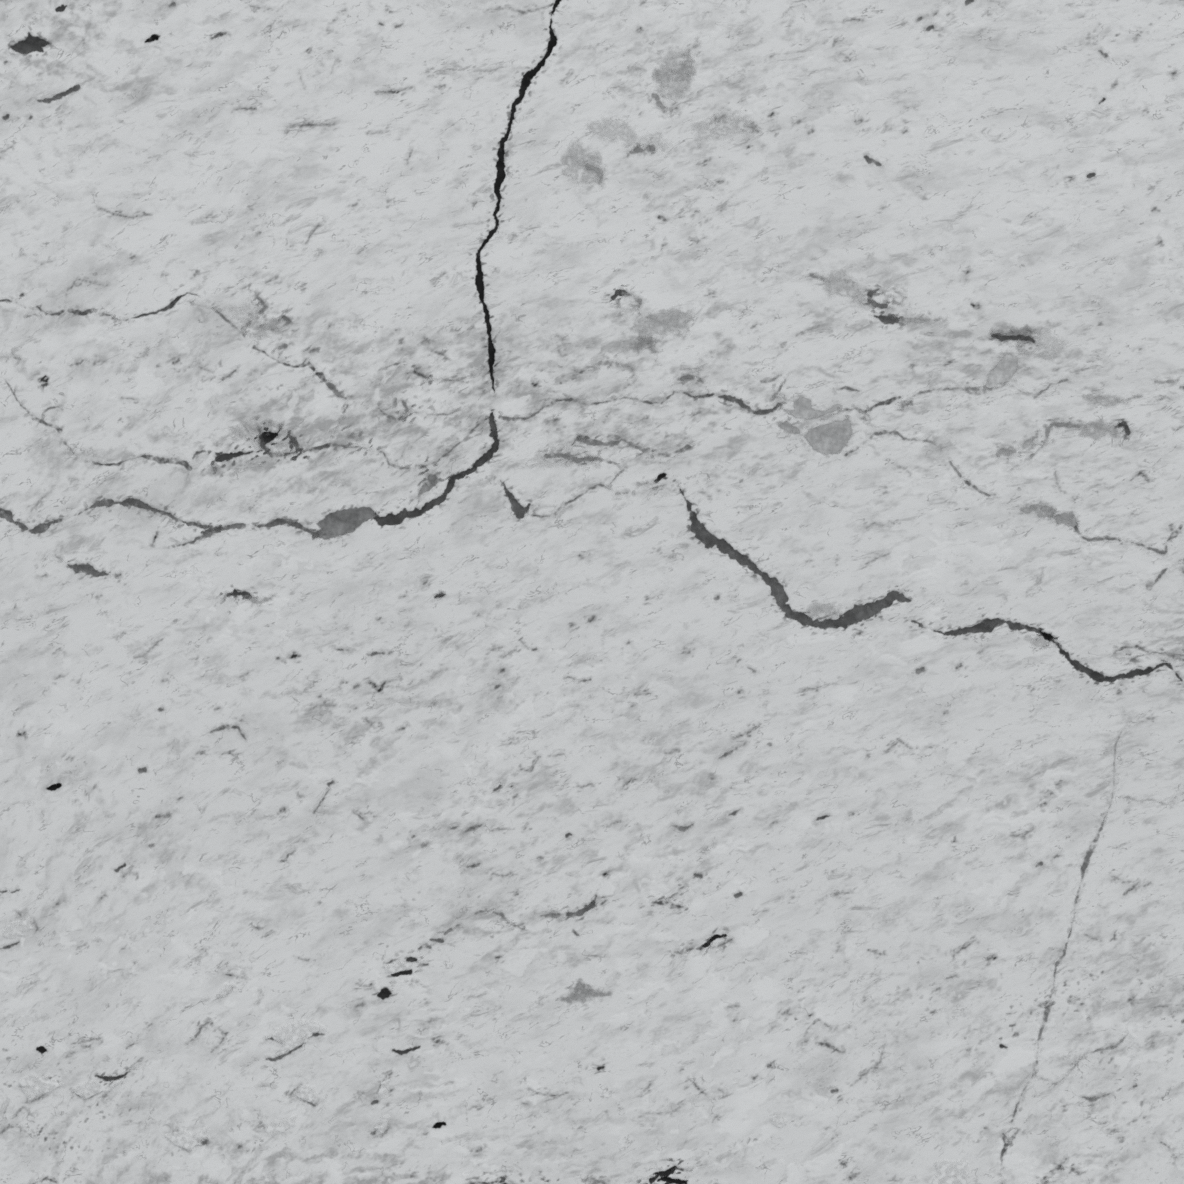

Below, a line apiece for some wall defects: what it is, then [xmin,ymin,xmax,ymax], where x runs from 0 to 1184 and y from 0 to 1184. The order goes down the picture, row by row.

crack [0,0,1182,684]
crack [388,911,515,977]
crack [541,895,604,936]
crack [1036,823,1103,1063]
crack [1001,1089,1025,1158]